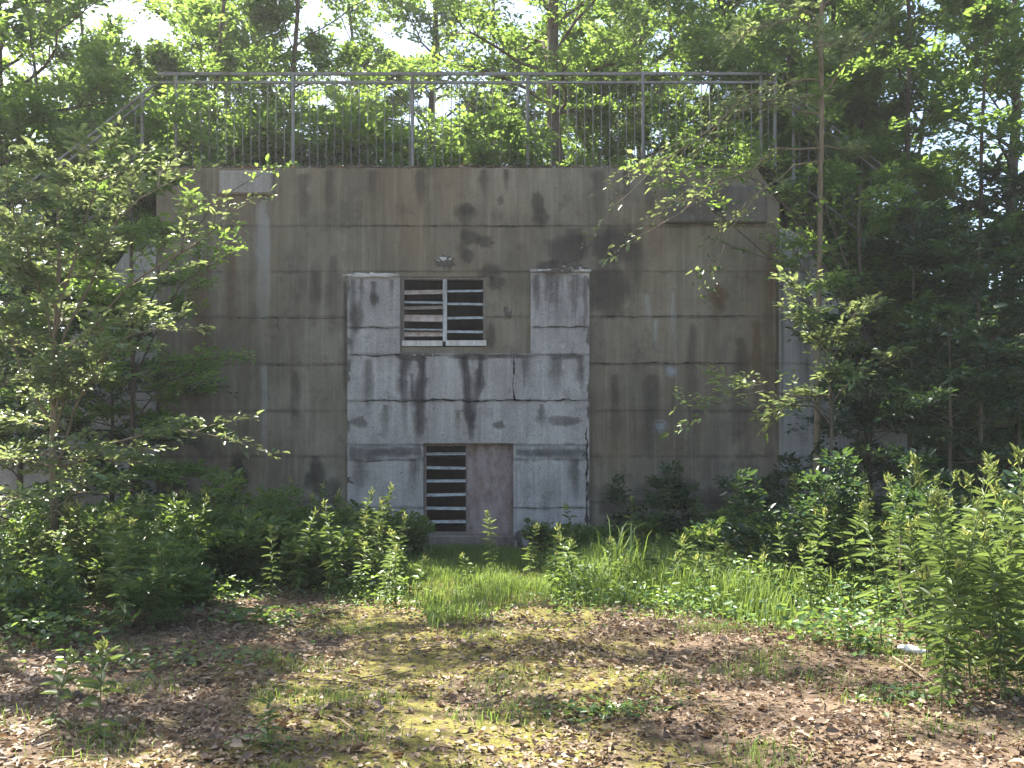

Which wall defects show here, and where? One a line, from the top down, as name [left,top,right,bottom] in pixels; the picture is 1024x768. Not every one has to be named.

water stain [399,353,425,433]
crack [359,358,584,410]